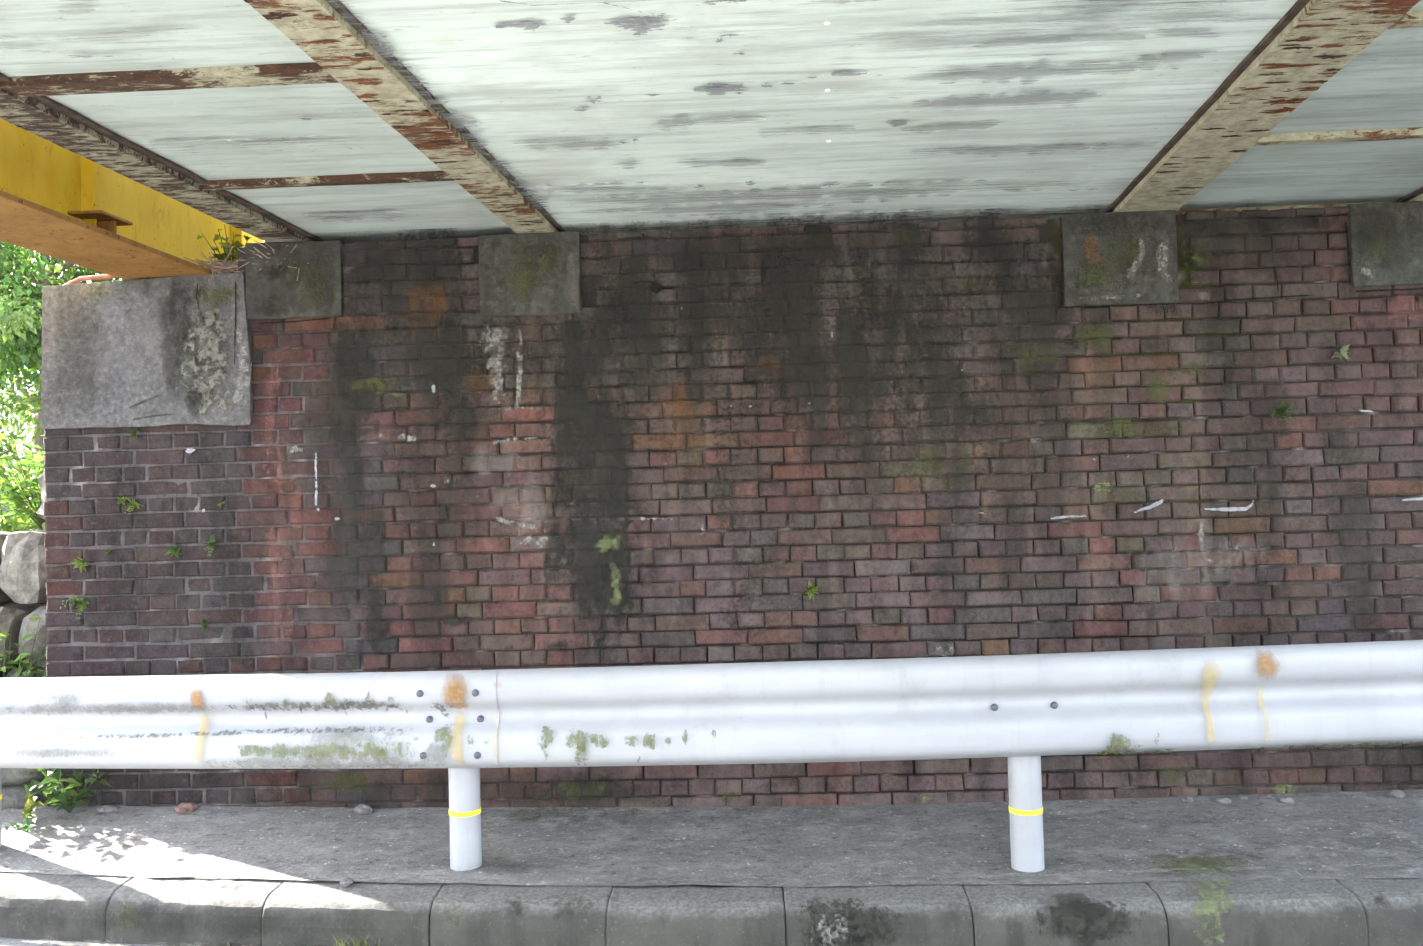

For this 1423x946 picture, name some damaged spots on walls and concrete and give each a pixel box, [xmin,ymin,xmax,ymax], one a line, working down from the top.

damp [877,0,1273,107]
damp [326,1,553,215]
damp [514,139,620,150]
damp [902,122,997,133]
damp [919,143,1140,157]
damp [567,161,1099,231]
damp [169,287,201,365]
damp [482,328,537,410]
damp [332,329,416,652]
damp [497,291,672,636]